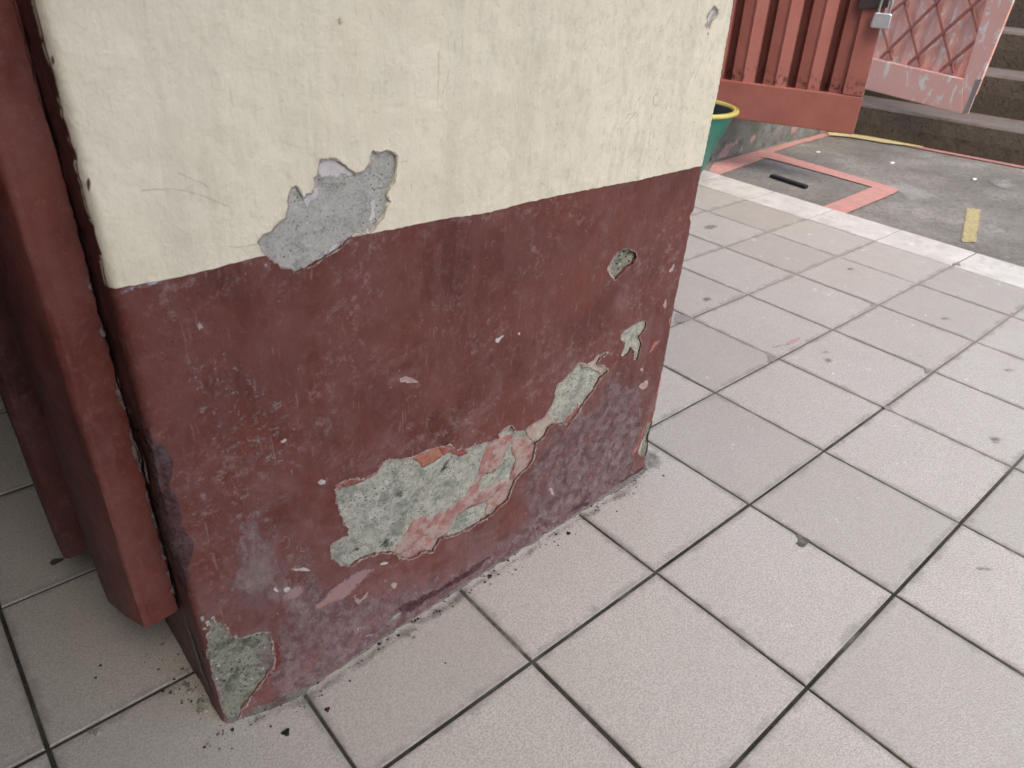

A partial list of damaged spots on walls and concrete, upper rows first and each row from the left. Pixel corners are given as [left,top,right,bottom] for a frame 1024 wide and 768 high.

spalling [257,150,398,274]
spalling [607,248,638,281]
spalling [315,321,661,612]
spalling [200,616,281,724]